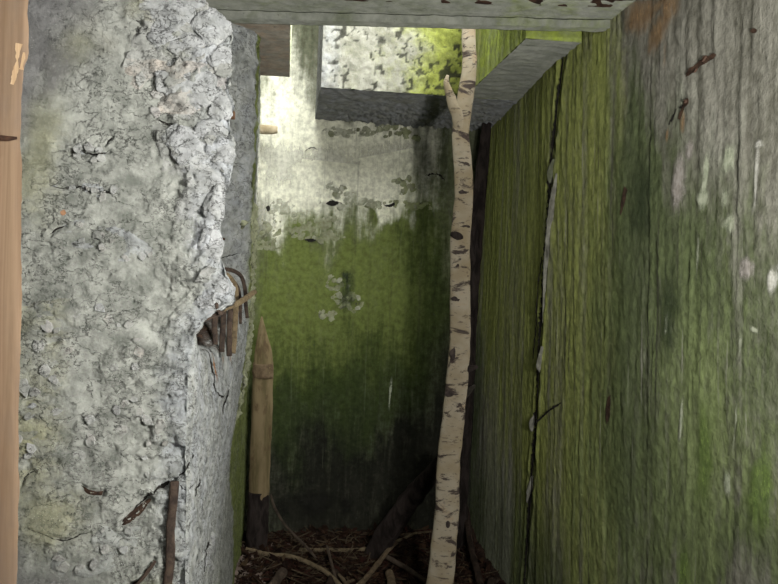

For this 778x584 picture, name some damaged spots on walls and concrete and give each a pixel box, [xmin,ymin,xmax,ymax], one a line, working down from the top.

water stain [673,144,692,202]
water stain [697,157,709,207]
water stain [722,148,734,172]
spalling [122,0,433,424]
water stain [740,259,754,277]
water stain [768,271,778,290]
crack [523,57,564,584]